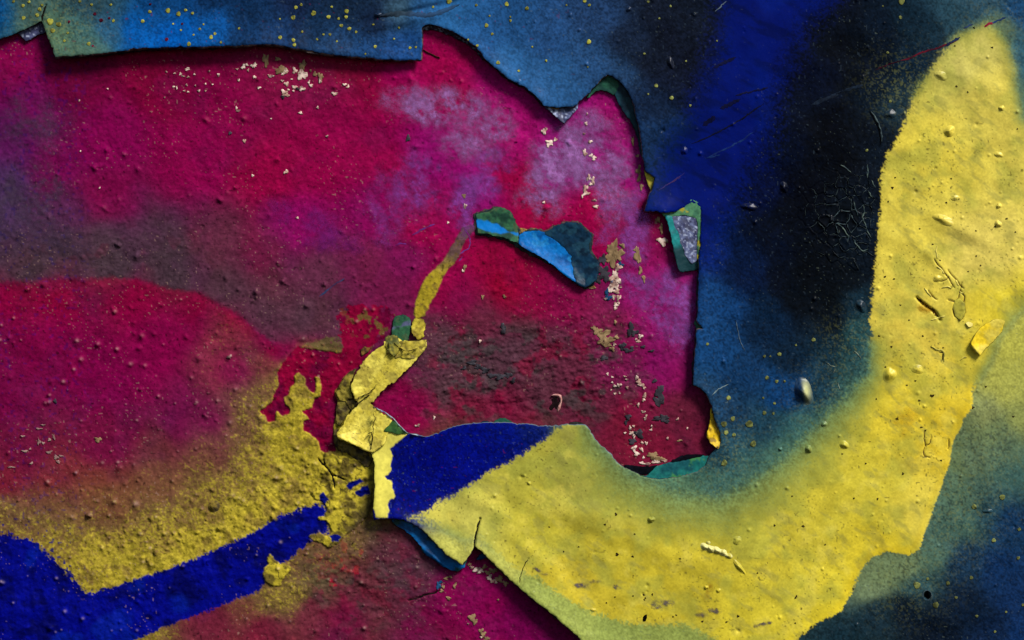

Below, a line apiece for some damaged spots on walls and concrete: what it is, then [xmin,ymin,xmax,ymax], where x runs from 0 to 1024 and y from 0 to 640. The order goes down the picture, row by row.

peeling [236,54,324,99]
peeling [545,105,578,123]
peeling [587,75,642,157]
peeling [661,200,701,272]
crack [805,174,877,268]
peeling [462,194,654,361]
peeling [333,314,427,467]
peeling [624,414,648,456]
peeling [635,375,669,431]
peeling [707,408,720,449]
peeling [624,452,708,479]
peeling [391,519,467,572]